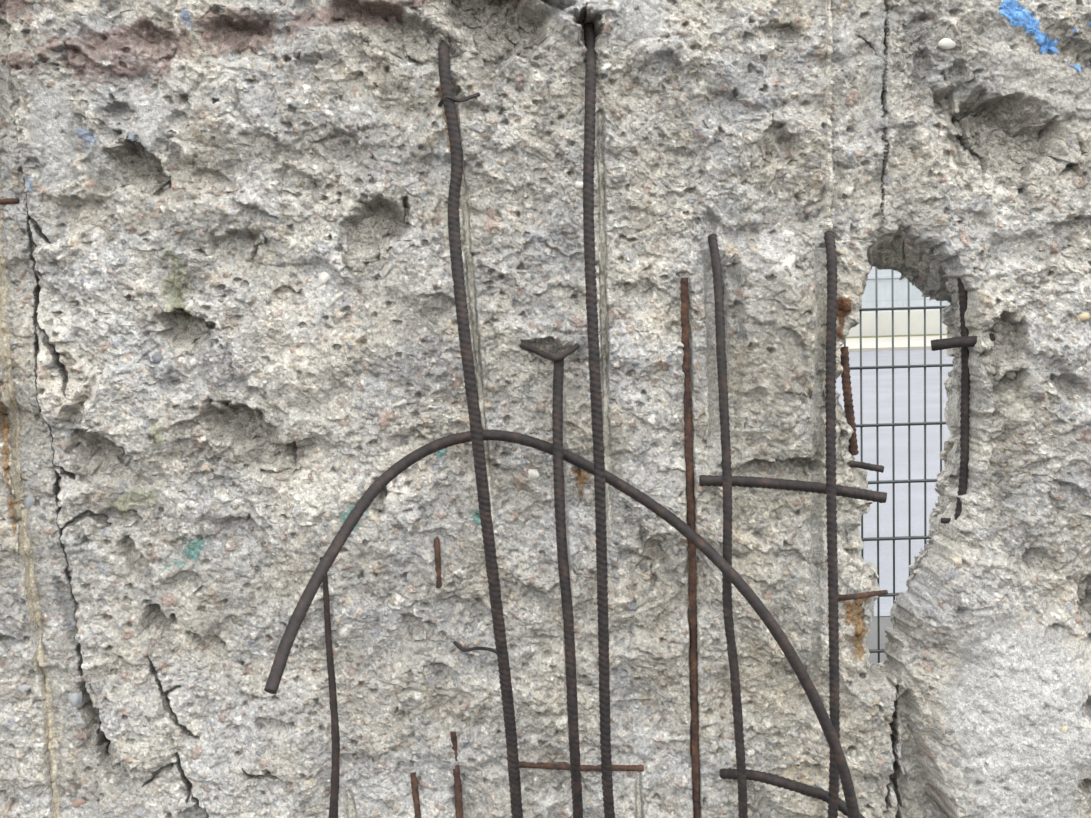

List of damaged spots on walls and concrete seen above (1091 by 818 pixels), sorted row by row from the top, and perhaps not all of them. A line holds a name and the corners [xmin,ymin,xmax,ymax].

crack [858,0,890,218]
peeling [869,43,891,136]
spalling [341,189,409,279]
corrosion [836,296,853,339]
corrosion [0,382,21,533]
crack [17,131,111,688]
spalling [201,392,311,478]
spalling [340,480,387,531]
corrosion [572,469,590,496]
corrosion [841,598,869,660]
crack [141,656,209,818]
crack [885,683,902,818]